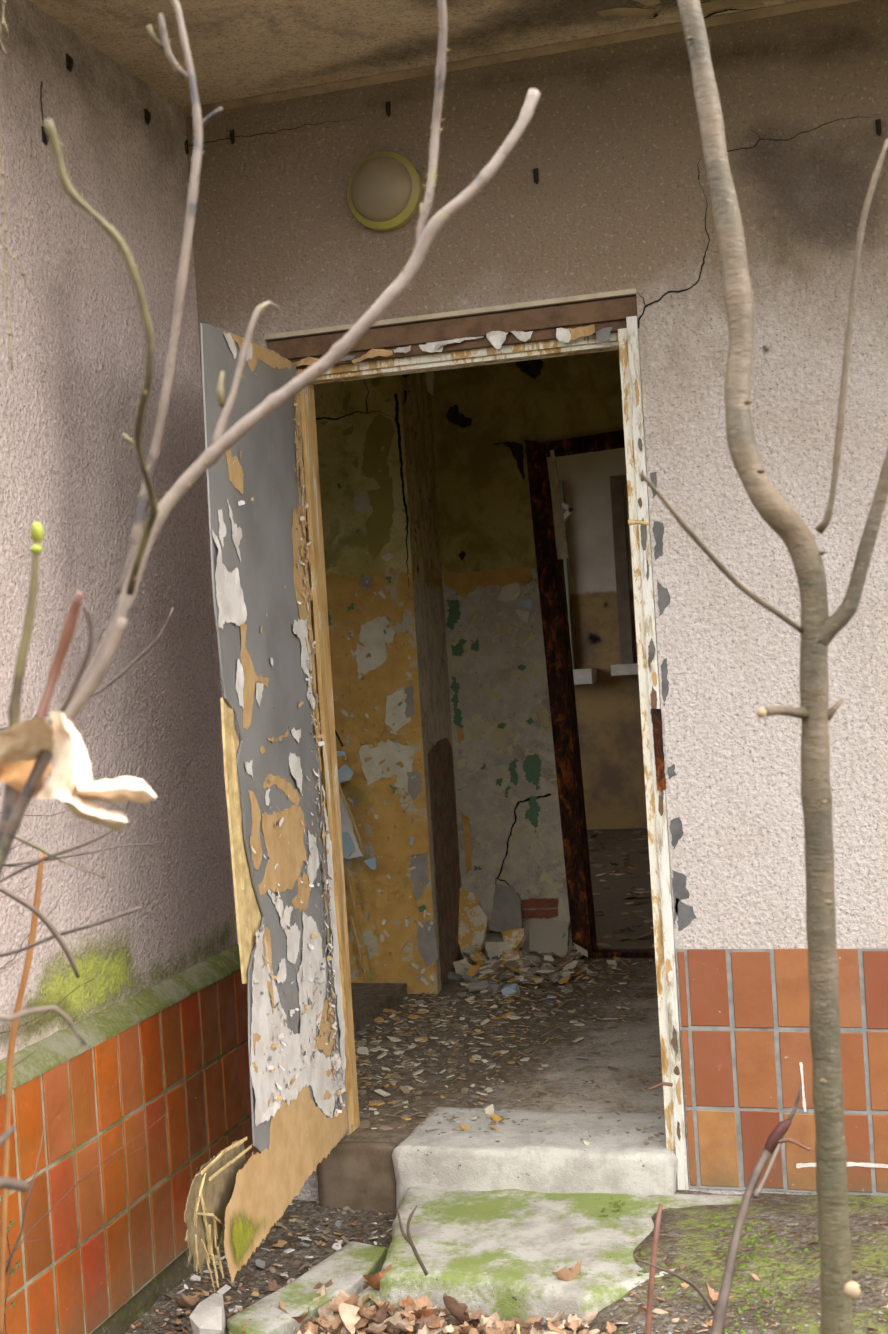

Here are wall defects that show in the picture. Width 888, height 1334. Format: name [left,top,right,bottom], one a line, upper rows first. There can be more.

spalling [700,0,763,19]
crack [636,113,884,329]
peeling [340,331,533,364]
spalling [516,359,543,378]
peeling [556,324,613,344]
crack [316,374,409,586]
peeling [212,498,254,629]
peeling [236,659,275,709]
peeling [251,377,482,1127]
peeling [496,753,542,833]
crack [495,793,551,886]
spalling [521,898,559,919]